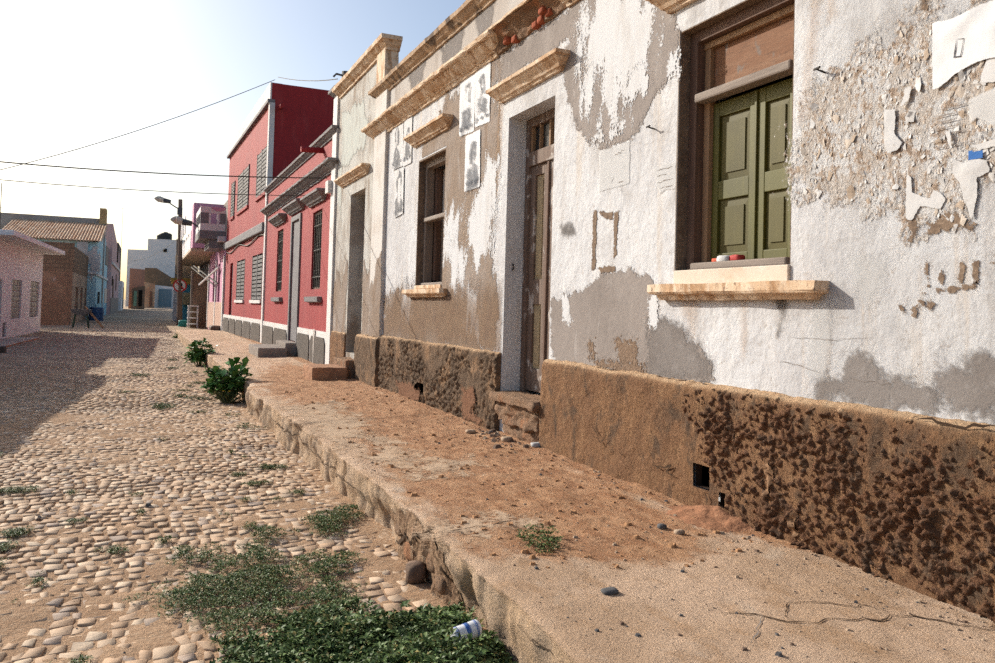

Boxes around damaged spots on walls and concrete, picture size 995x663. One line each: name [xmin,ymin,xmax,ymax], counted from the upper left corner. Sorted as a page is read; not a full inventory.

flaking render [368,0,682,352]
flaking render [782,0,995,247]
flaking render [550,265,995,623]
crack [701,601,995,642]